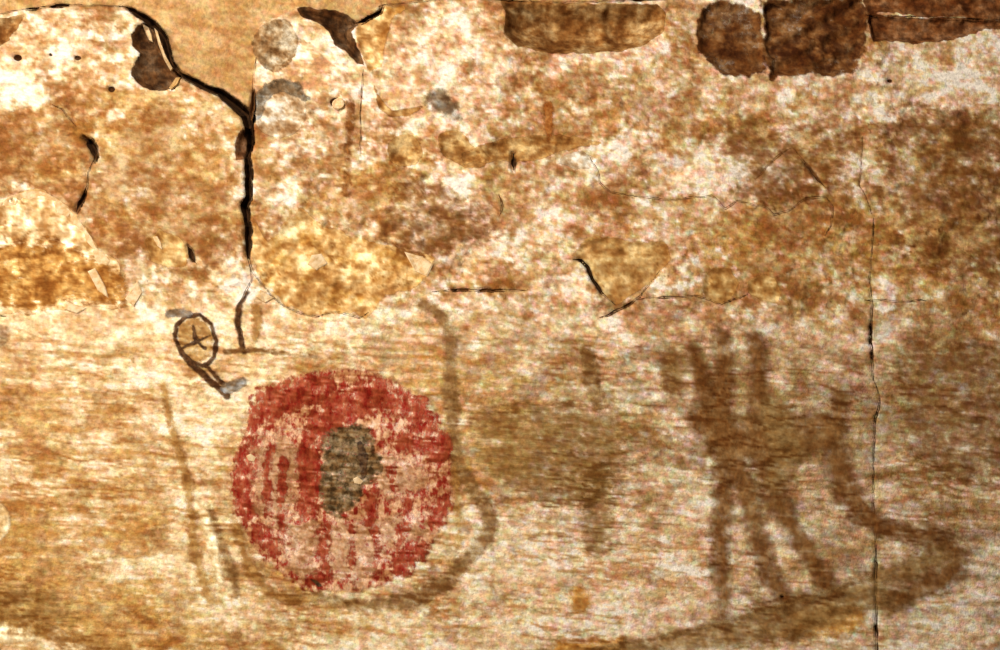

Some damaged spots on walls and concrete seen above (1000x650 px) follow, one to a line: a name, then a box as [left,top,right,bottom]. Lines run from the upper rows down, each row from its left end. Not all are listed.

hole [131,23,182,91]
spalling [501,1,666,54]
spalling [696,0,1000,81]
crack [0,3,369,318]
crack [858,136,926,511]